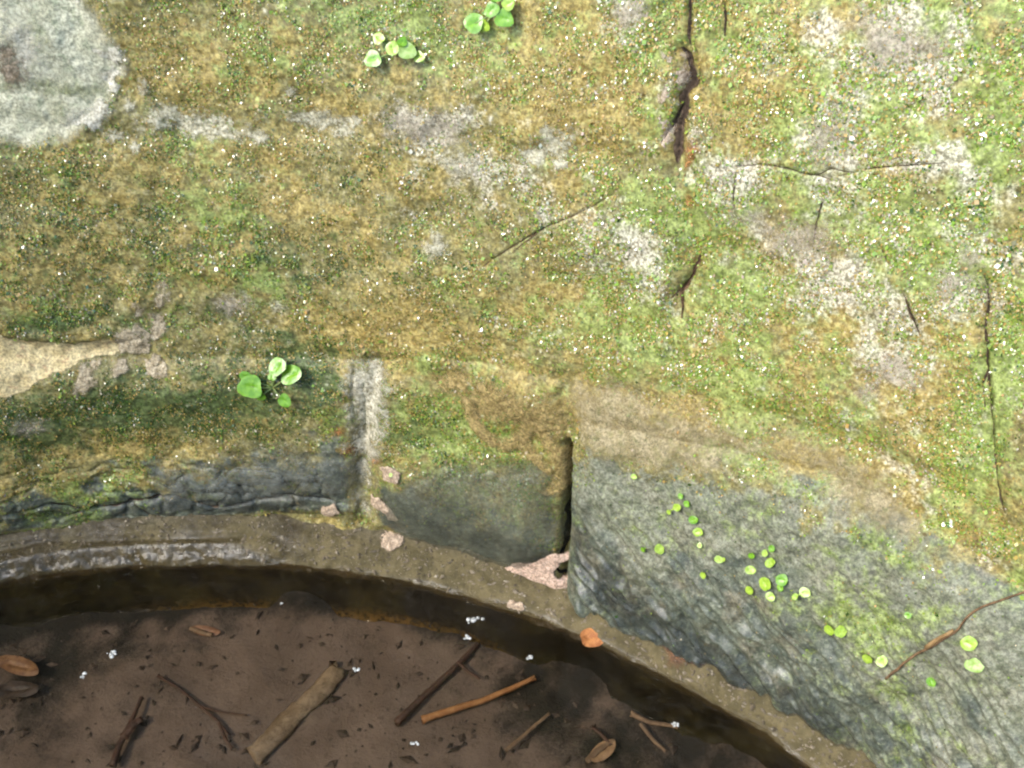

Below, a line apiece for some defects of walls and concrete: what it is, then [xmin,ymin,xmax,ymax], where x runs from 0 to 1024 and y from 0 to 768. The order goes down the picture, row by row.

crack [658,0,699,170]
crack [483,192,615,266]
crack [733,162,946,246]
crack [671,254,701,318]
crack [982,274,1006,514]